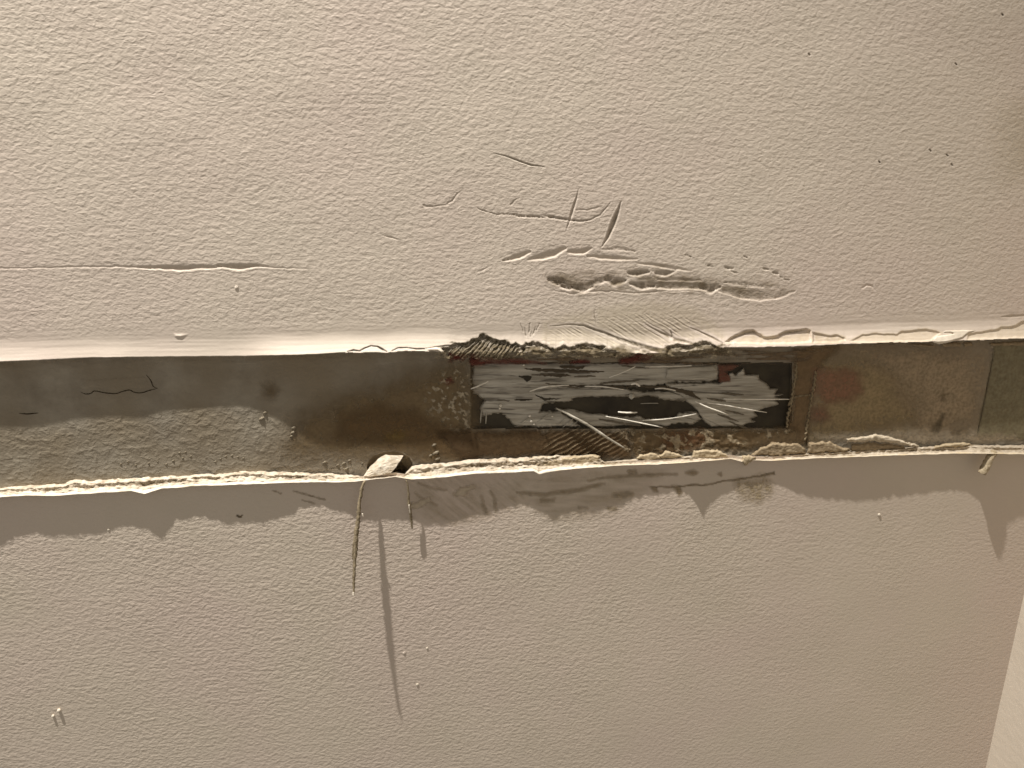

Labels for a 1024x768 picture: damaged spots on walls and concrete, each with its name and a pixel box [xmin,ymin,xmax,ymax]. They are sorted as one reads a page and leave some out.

crack [0,260,309,274]
spalling [723,318,1024,347]
peeling [345,343,458,354]
leakage [290,345,1024,462]
spalling [0,434,1024,497]